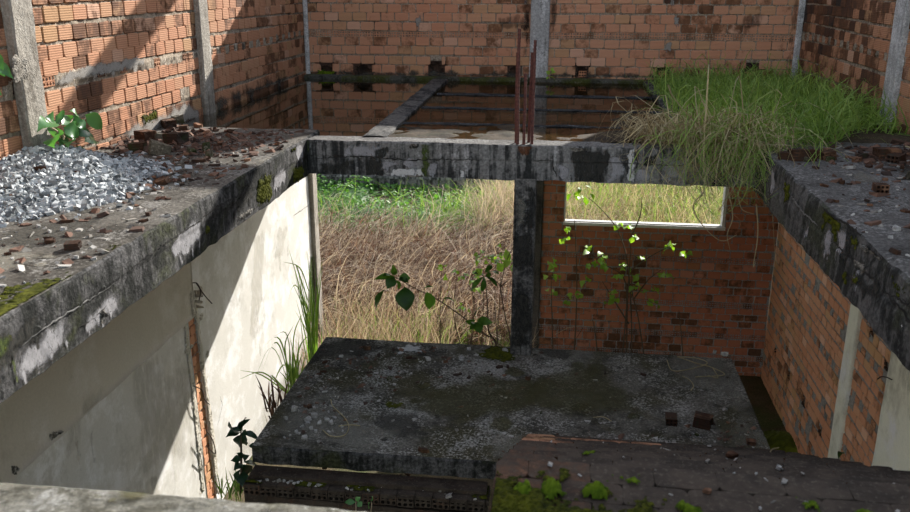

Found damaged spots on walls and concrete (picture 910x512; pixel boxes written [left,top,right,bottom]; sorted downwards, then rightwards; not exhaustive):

water stain [318,144,437,177]
water stain [558,149,685,185]
water stain [0,208,105,248]
water stain [172,220,201,264]
water stain [823,229,850,267]
crack [791,196,910,323]
water stain [86,296,117,335]
water stain [0,318,72,385]
spalling [184,286,220,494]
water stain [375,413,428,441]